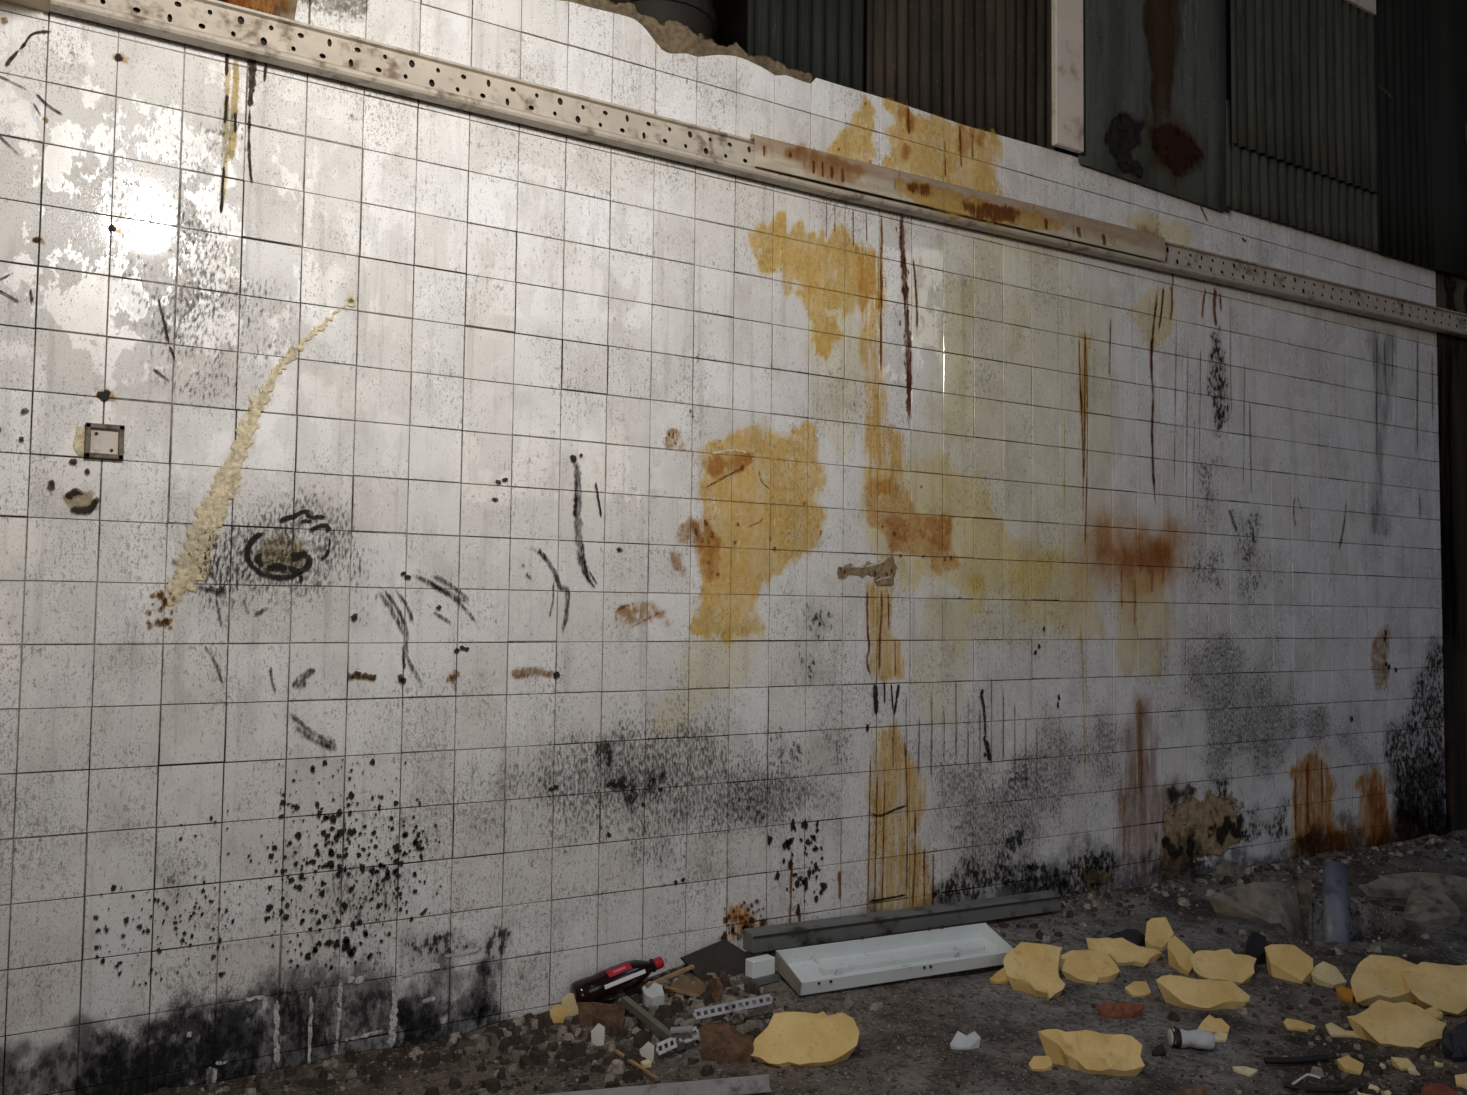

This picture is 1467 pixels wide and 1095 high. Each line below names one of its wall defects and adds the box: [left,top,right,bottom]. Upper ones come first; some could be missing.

spalling [561,0,813,113]
rust [908,183,929,195]
rust [963,201,1018,222]
rust [853,213,918,415]
rust [1079,335,1088,540]
rust [866,594,900,732]
damp [0,727,511,1095]
damp [533,695,841,923]
rust [867,743,934,904]
damp [918,630,1452,904]
spalling [1155,784,1244,881]
rust [1295,765,1323,828]